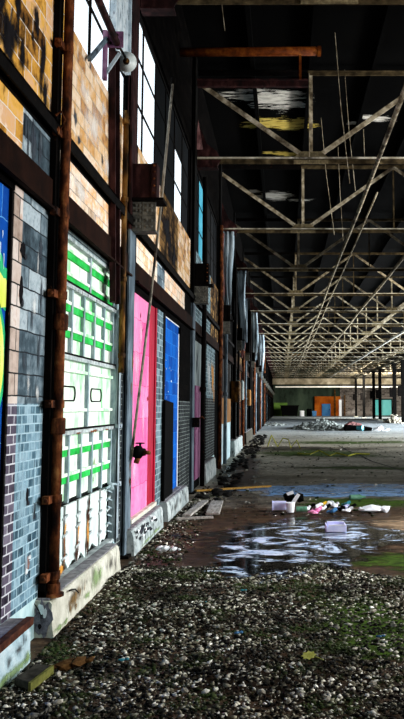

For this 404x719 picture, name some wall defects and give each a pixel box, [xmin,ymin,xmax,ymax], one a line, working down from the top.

damp [0,0,39,69]
damp [65,580,90,623]